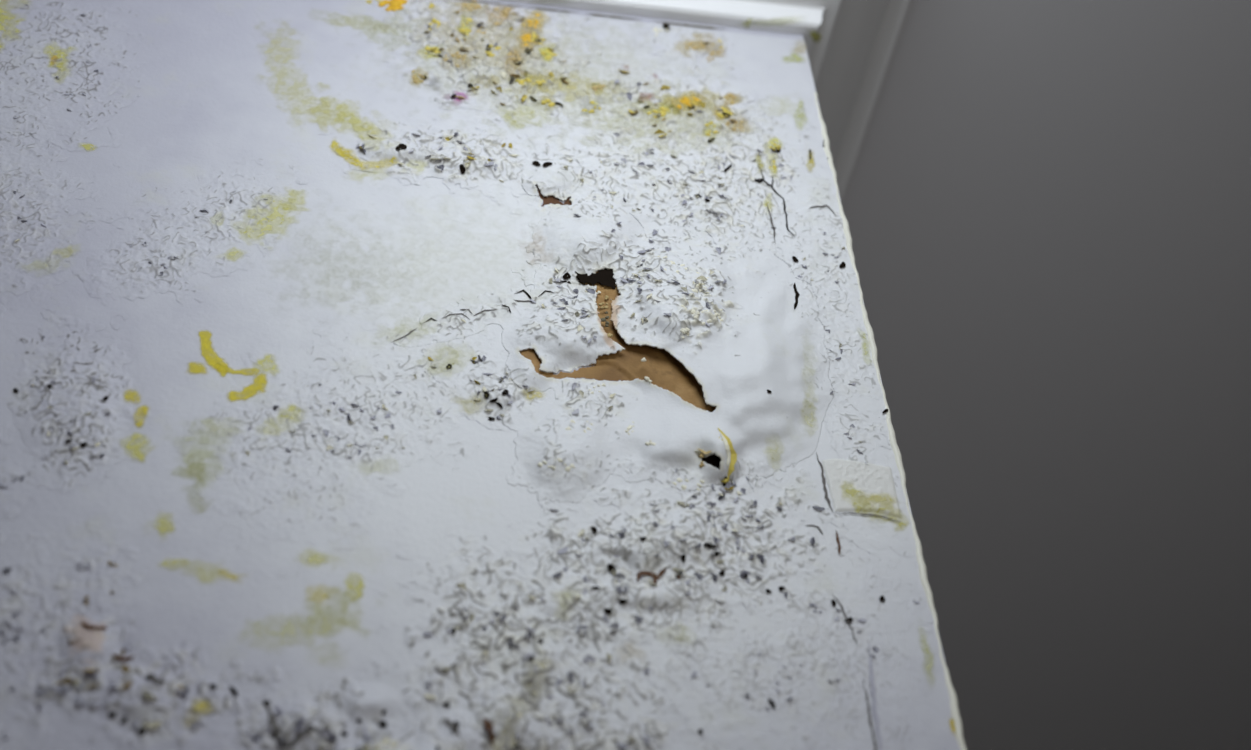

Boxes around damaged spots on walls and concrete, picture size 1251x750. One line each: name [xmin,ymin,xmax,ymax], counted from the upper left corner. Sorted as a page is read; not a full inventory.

mould [366,0,408,12]
mould [459,0,558,107]
mould [581,83,605,114]
damp [647,94,701,119]
damp [705,93,744,136]
damp [758,139,781,172]
peeling [0,0,943,750]
damp [695,428,737,484]